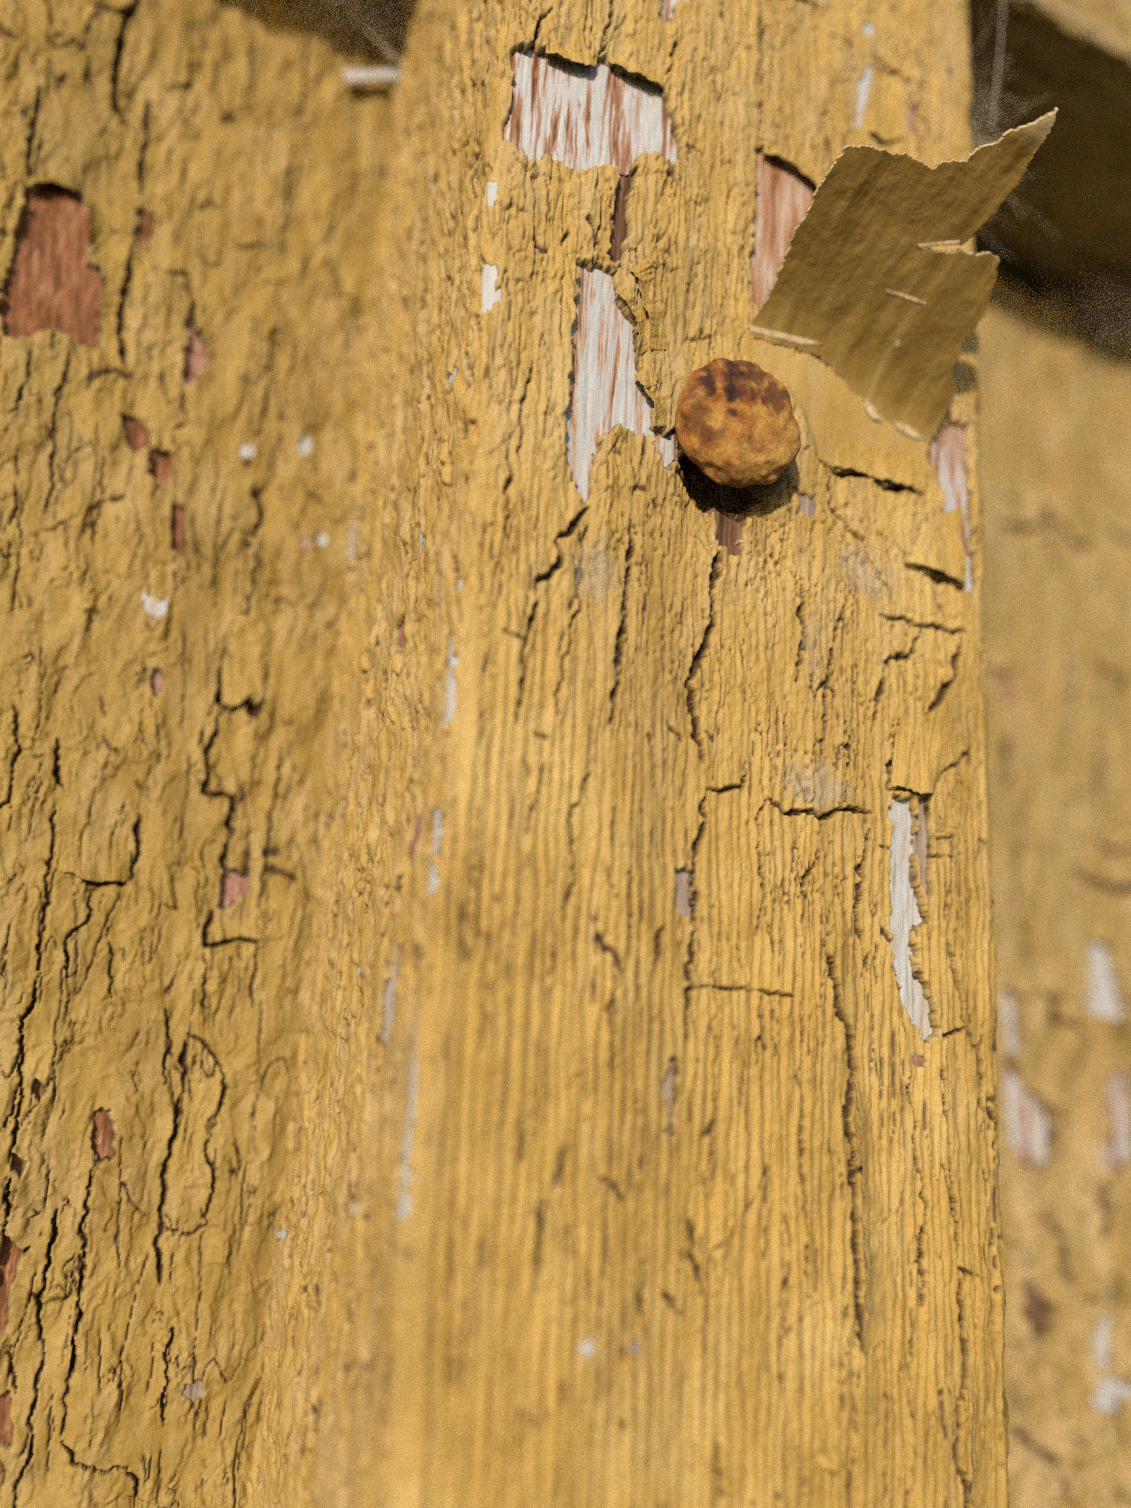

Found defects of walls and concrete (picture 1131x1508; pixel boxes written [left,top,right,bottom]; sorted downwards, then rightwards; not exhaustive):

peeling [545,40,669,89]
peeling [0,174,110,350]
peeling [747,65,1058,445]
peeling [834,441,922,490]
crack [201,666,279,905]
crack [503,507,587,832]
crack [608,527,632,722]
crack [666,556,716,744]
crack [771,761,890,820]
crack [0,708,141,1233]
crack [154,913,257,1281]
crack [8,1170,138,1508]